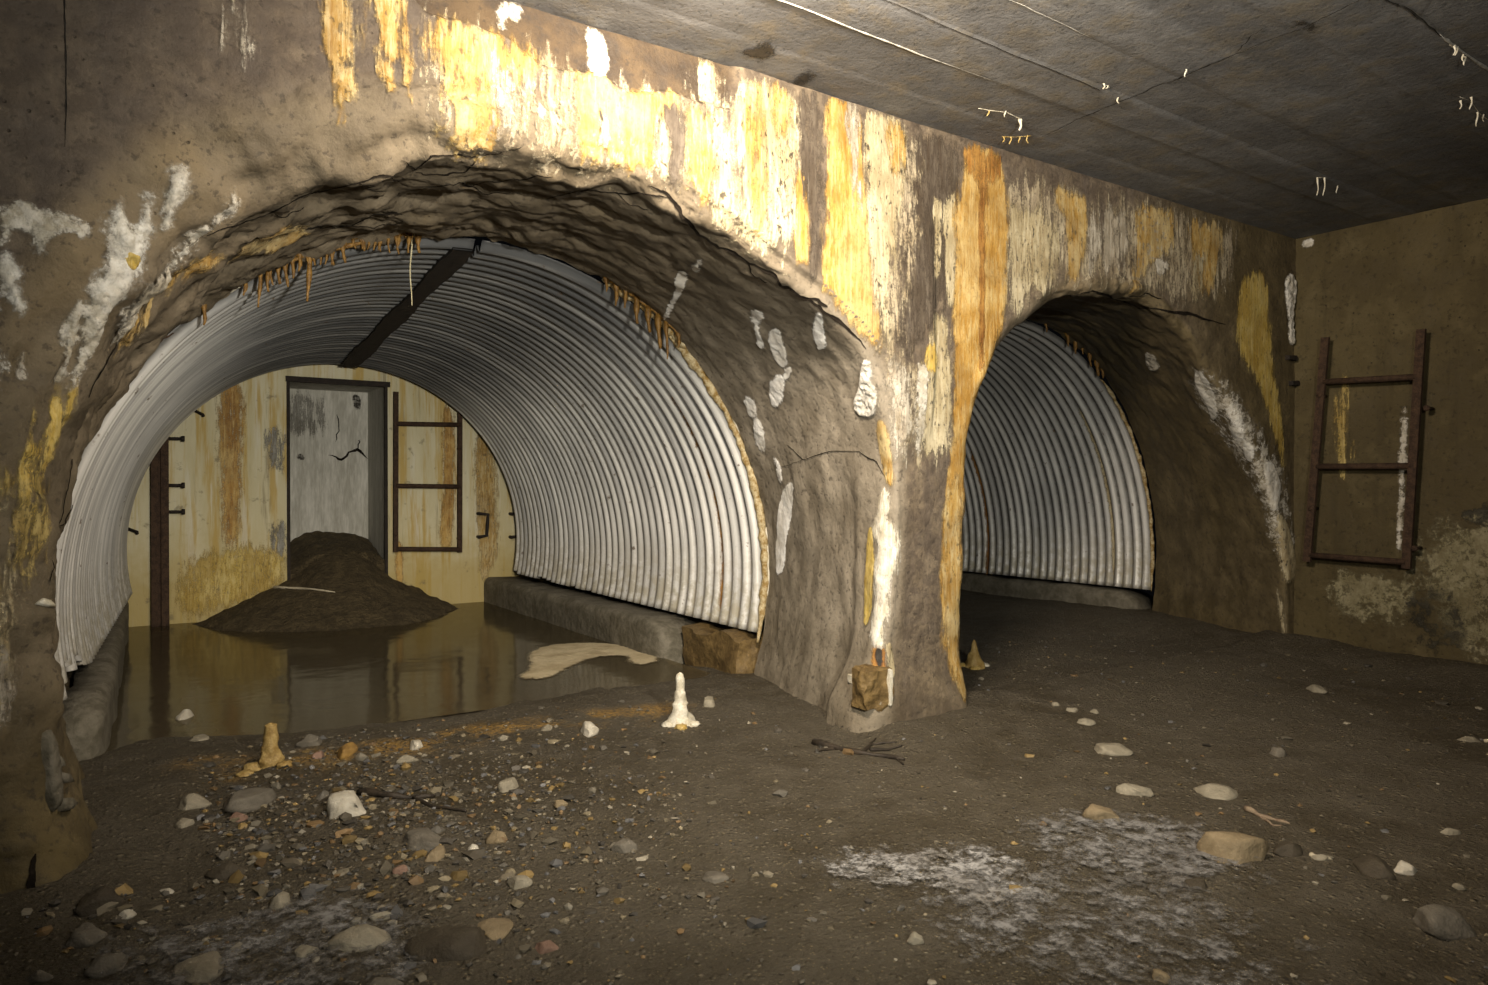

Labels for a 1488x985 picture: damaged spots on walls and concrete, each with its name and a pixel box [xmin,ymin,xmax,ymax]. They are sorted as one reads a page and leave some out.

water stain [220,0,255,61]
crack [885,0,1442,137]
crack [207,147,866,349]
water stain [322,0,1297,703]
water stain [0,165,308,727]
water stain [264,393,325,470]
water stain [1325,567,1468,654]